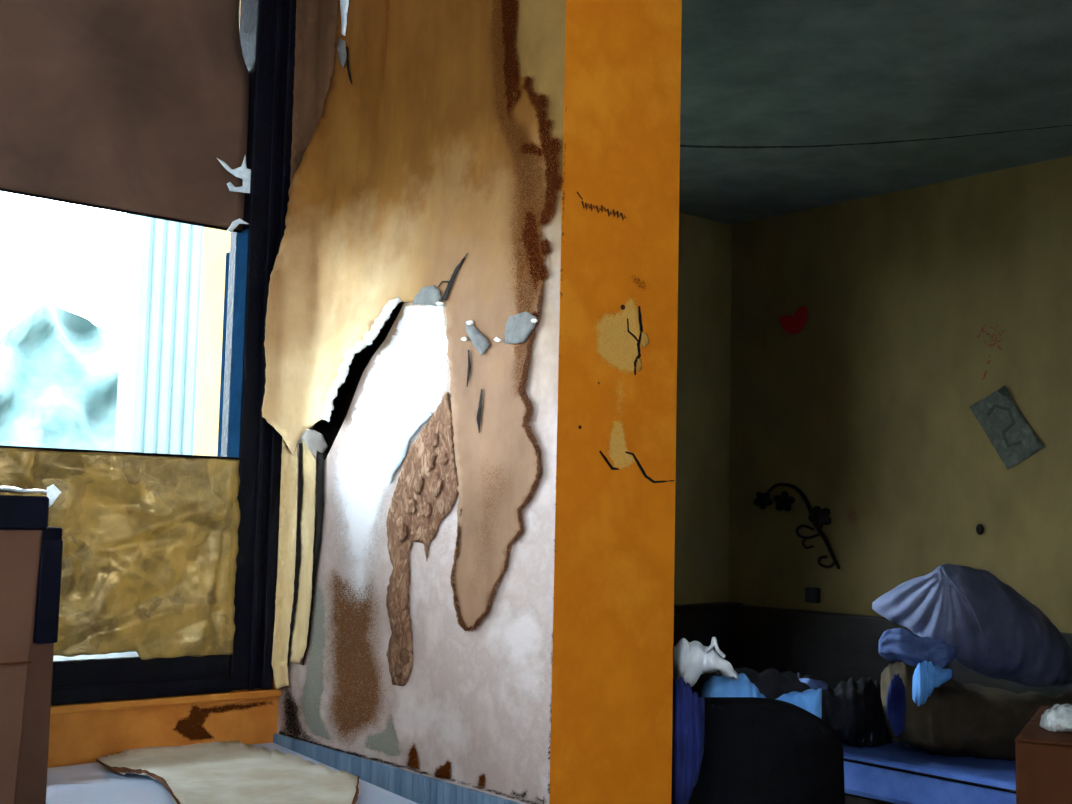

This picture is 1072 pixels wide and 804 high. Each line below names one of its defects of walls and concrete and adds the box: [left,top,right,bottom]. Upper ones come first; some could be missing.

peeling [337,38,347,68]
flaking render [272,302,449,690]
peeling [594,296,649,469]
crack [599,450,674,483]